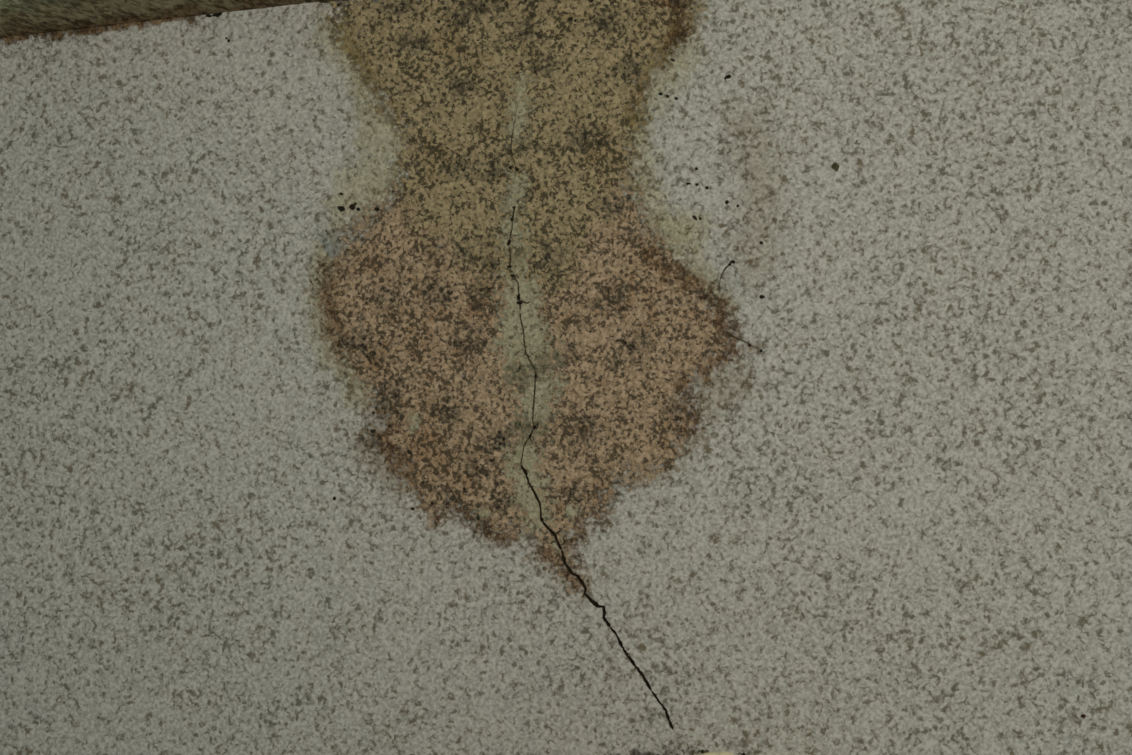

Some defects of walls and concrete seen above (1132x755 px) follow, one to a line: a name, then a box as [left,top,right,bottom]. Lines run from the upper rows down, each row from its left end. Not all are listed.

leakage [0,0,763,598]
crack [507,102,674,729]